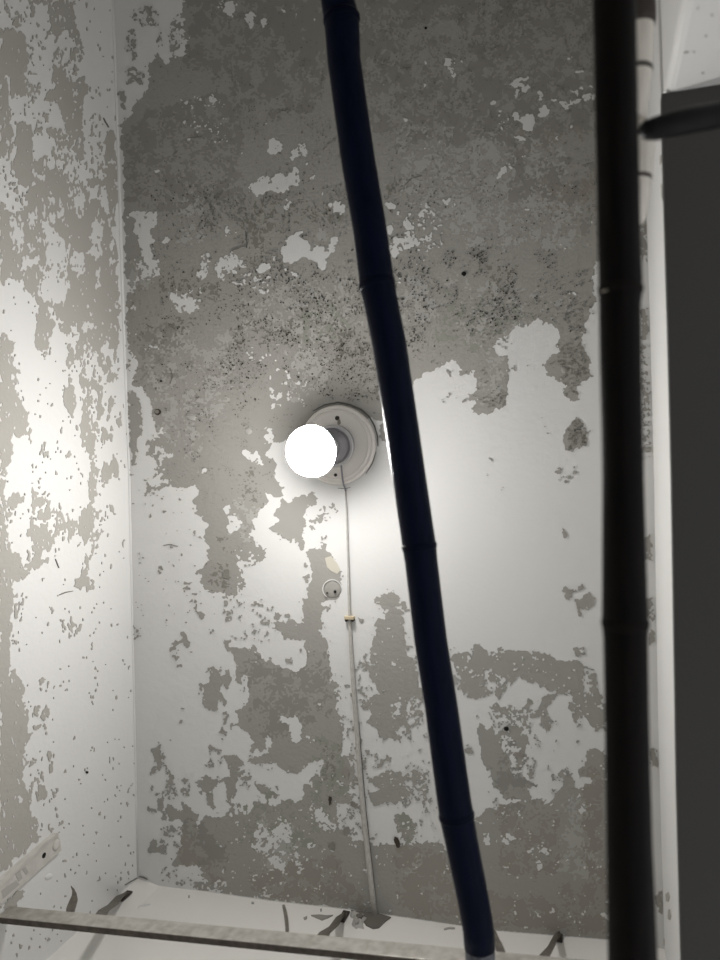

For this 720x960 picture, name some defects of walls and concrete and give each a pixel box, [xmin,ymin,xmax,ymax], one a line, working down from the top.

peeling [362,0,598,415]
peeling [0,0,462,929]
peeling [563,417,591,452]
peeling [562,584,596,617]
peeling [450,644,608,939]